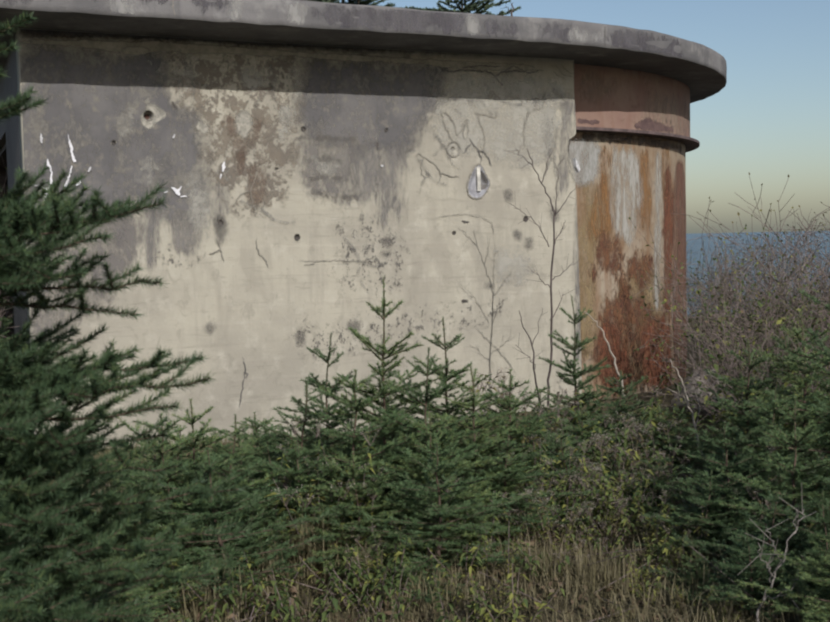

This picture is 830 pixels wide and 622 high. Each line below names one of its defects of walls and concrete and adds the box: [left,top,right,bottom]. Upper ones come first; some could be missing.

spalling [141,101,166,129]
damp [20,29,458,340]
rust [578,133,687,396]